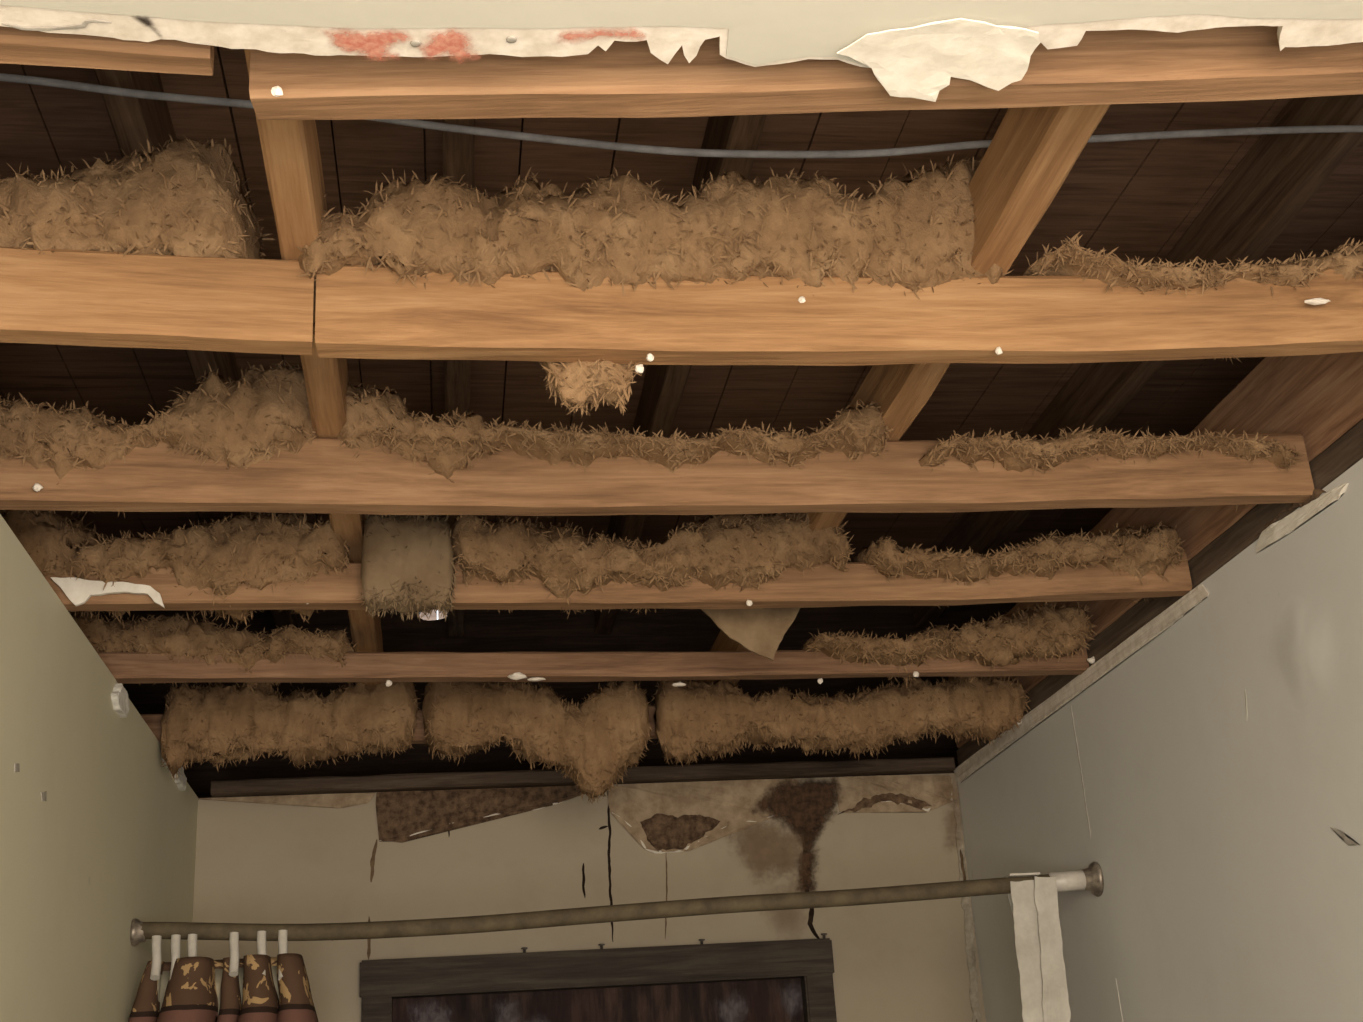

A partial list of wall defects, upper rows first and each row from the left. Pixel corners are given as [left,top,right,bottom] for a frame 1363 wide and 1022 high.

flaking render [1255,489,1326,536]
peeling [111,683,130,718]
flaking render [162,758,581,843]
flaking render [608,778,799,854]
leakage [742,778,841,892]